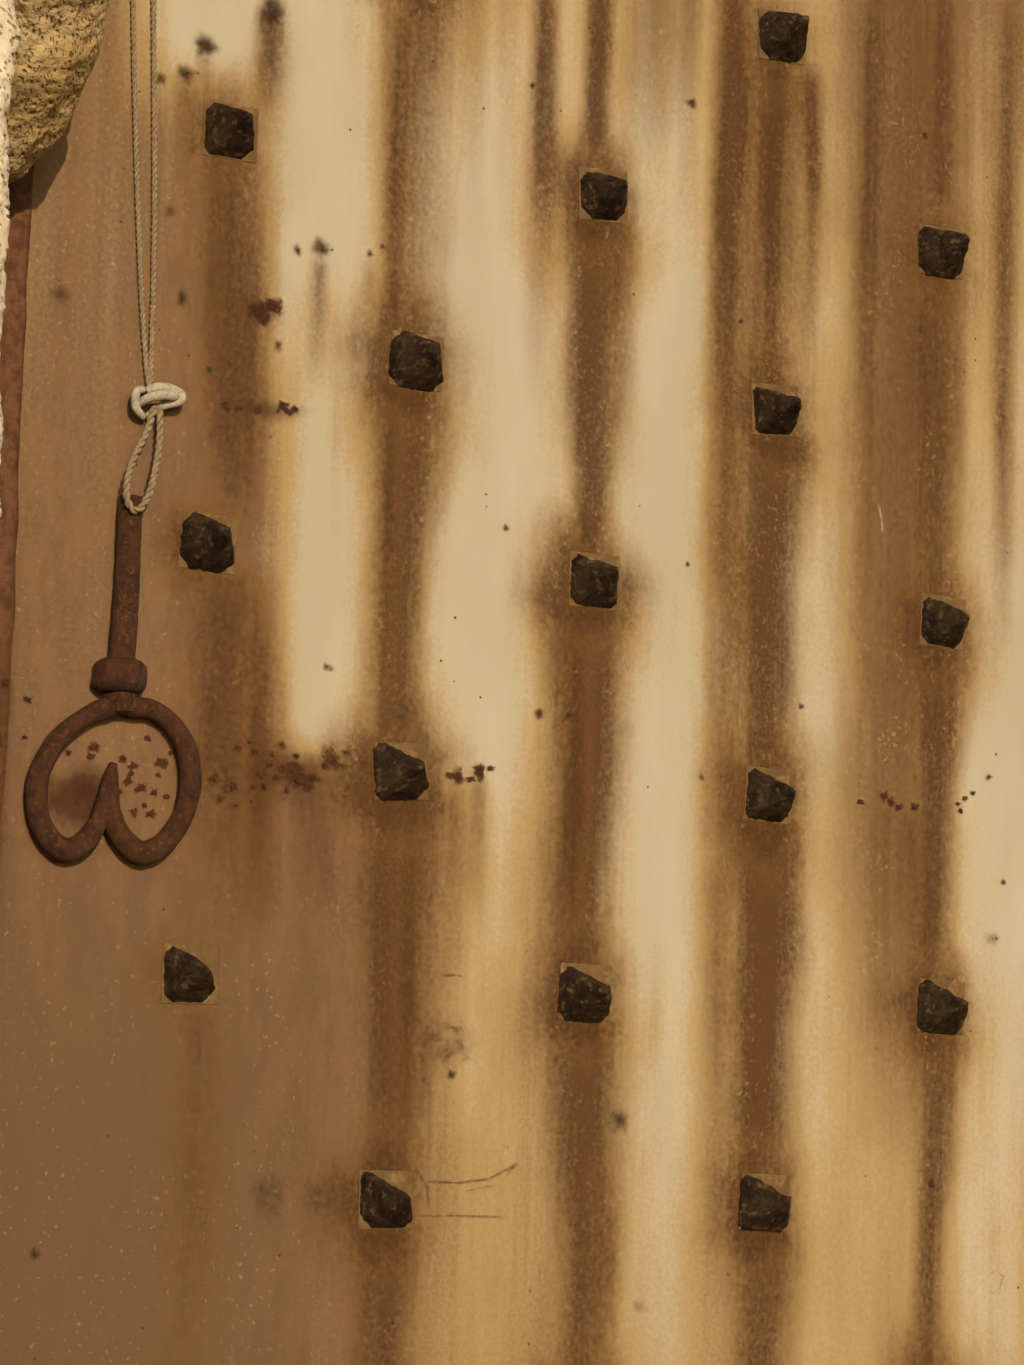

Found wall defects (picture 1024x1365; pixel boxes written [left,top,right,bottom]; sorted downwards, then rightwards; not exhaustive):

corrosion [197,38,217,53]
corrosion [862,18,880,295]
corrosion [997,30,1014,480]
corrosion [50,742,101,820]
corrosion [119,751,172,818]
corrosion [207,0,495,1365]
corrosion [531,0,634,1365]
corrosion [714,0,821,1365]
corrosion [880,276,976,1365]